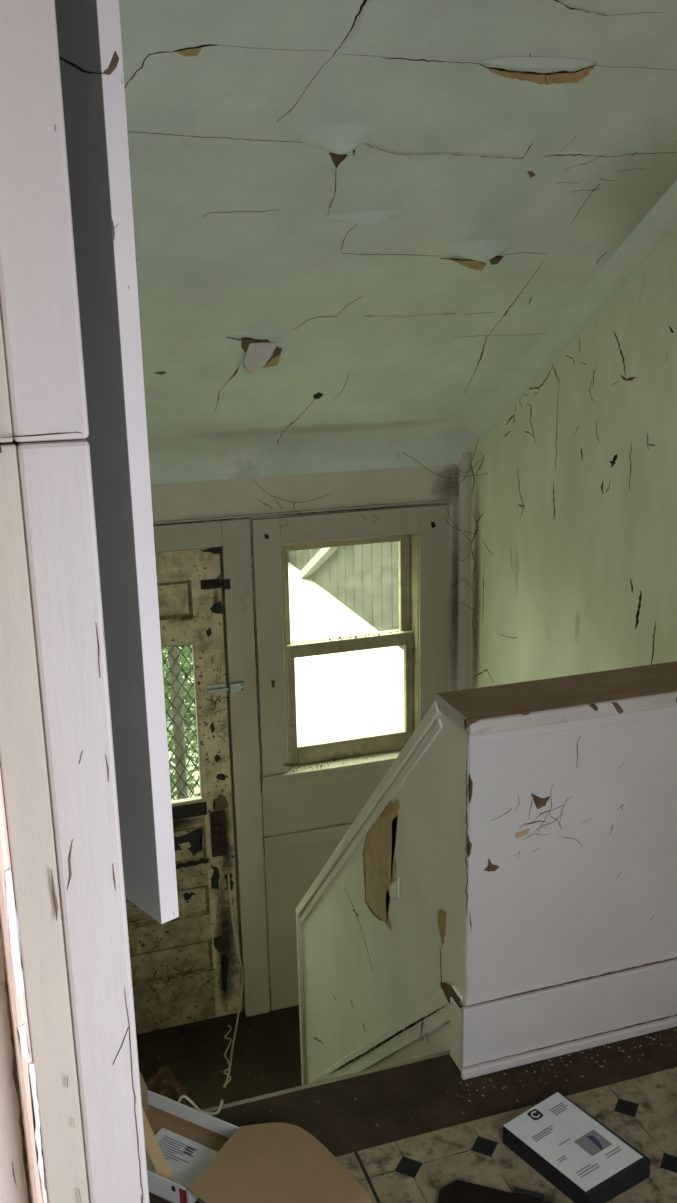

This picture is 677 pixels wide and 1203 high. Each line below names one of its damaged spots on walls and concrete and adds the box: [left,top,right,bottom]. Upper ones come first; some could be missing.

crack [554,0,662,16]
crack [59,51,174,88]
crack [128,0,480,143]
peeling [480,54,597,85]
spalling [329,152,347,169]
crack [328,142,676,256]
peeling [441,256,504,271]
peeling [227,337,282,373]
crack [529,365,558,390]
crack [470,415,517,643]
peeling [363,799,401,931]
spalling [441,983,462,1008]